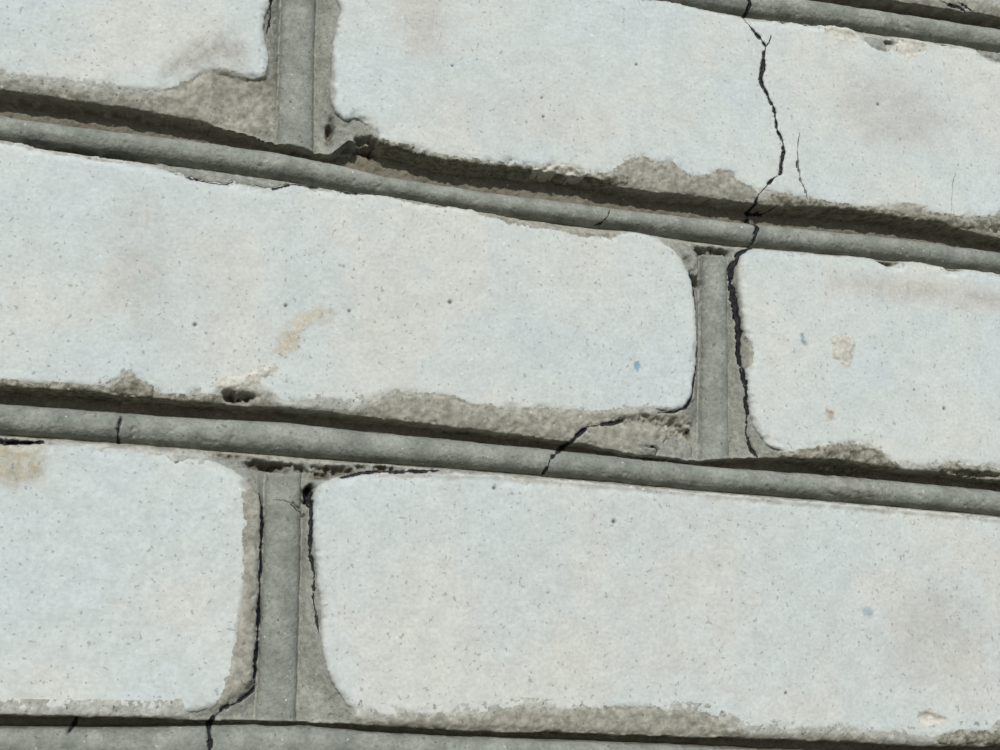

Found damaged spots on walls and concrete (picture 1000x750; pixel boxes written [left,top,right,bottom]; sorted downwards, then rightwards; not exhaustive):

crack [728,0,828,458]
spalling [771,192,998,232]
crack [658,270,697,413]
crack [544,420,624,472]
crack [339,470,439,478]
crack [206,490,319,750]
spalling [916,708,1000,747]